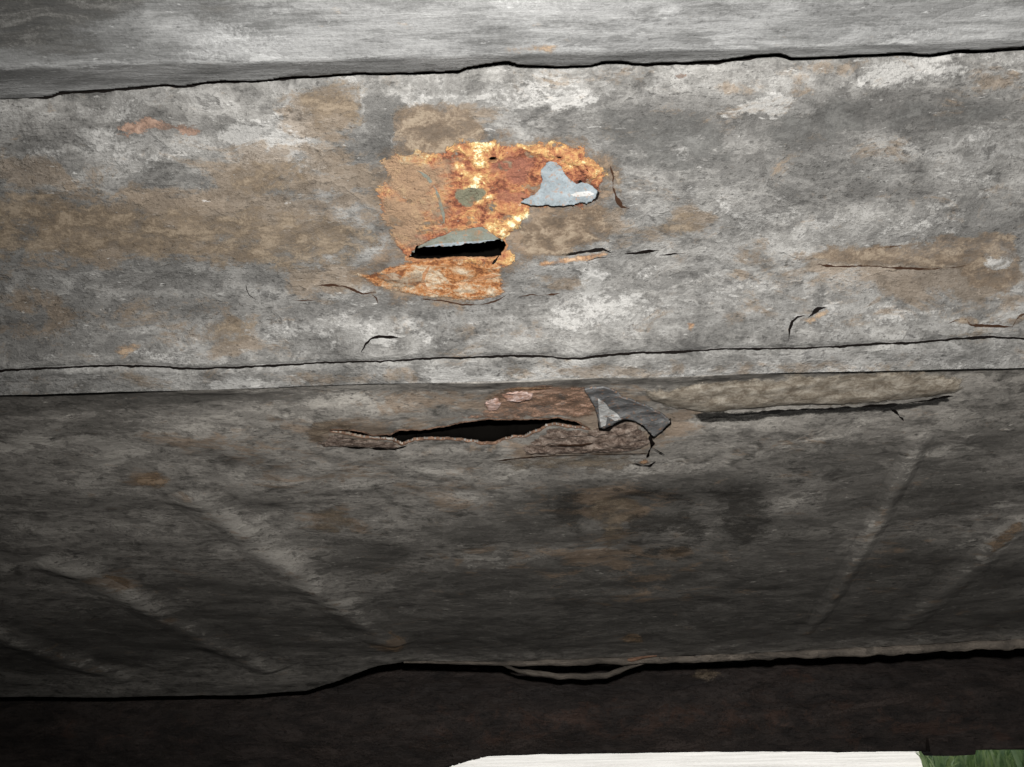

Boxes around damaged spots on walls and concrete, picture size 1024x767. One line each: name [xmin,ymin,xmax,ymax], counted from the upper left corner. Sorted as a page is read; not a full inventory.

crack [29,48,1024,99]
corrosion [0,139,616,283]
peeling [521,161,599,206]
spalling [356,227,504,306]
crack [561,248,684,261]
crack [0,307,1024,373]